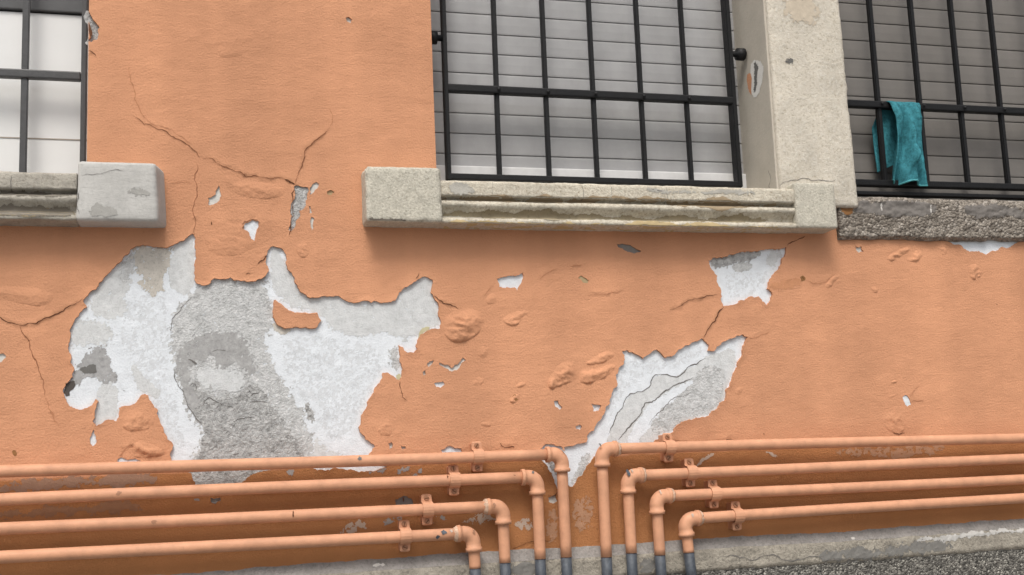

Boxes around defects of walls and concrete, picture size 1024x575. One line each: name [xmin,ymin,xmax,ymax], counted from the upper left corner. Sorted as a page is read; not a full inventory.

crack [130,77,333,235]
peeling [289,183,334,231]
peeling [497,273,523,289]
peeling [709,248,785,306]
peeling [951,240,1017,254]
crack [0,299,82,423]
peeling [63,234,441,485]
crack [609,294,724,440]
peeling [515,335,747,543]